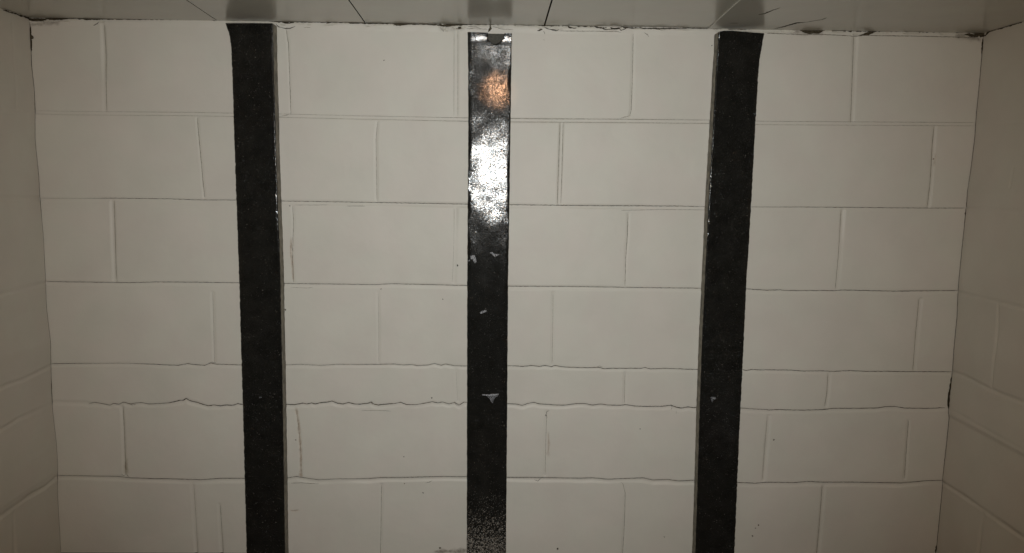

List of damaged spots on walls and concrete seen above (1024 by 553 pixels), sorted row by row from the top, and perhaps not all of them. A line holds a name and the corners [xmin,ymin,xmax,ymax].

crack [4,10,145,97]
crack [95,112,234,283]
crack [269,8,1024,553]
crack [130,355,236,366]
crack [93,398,245,547]